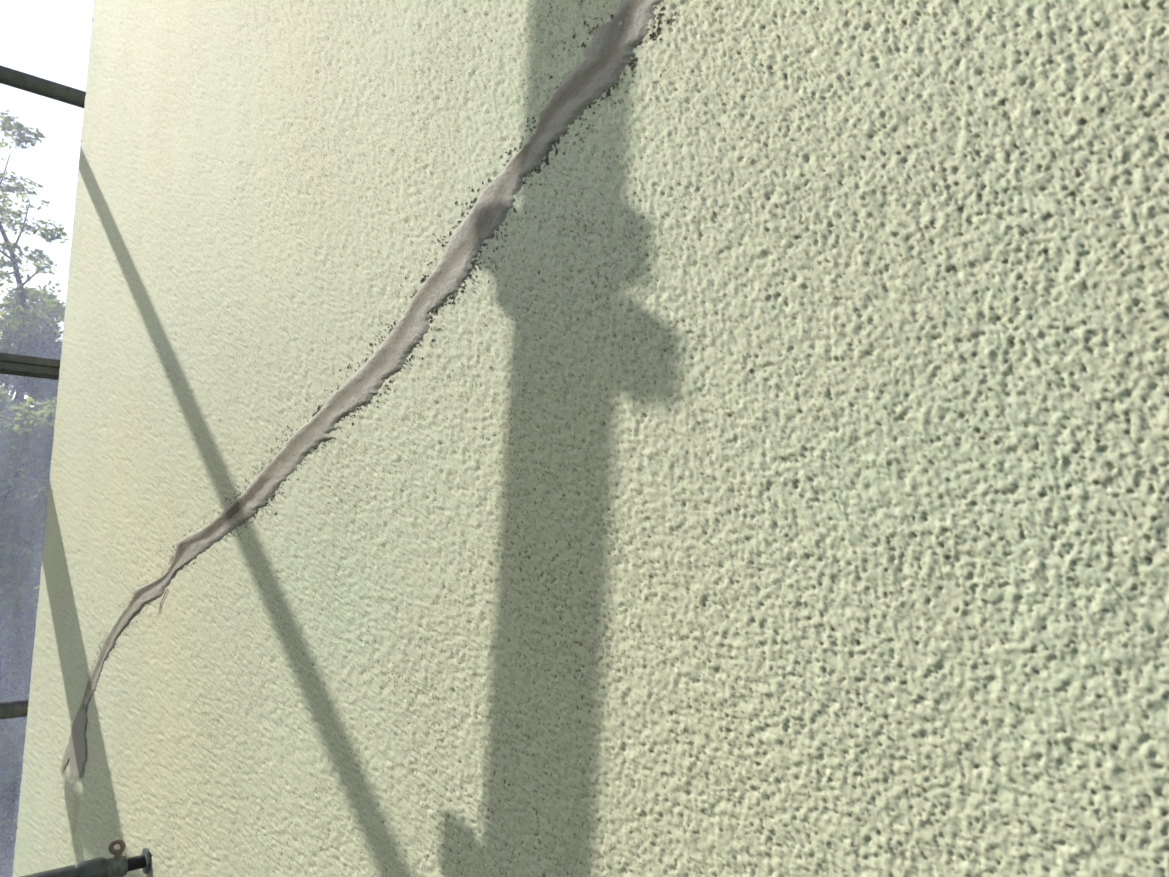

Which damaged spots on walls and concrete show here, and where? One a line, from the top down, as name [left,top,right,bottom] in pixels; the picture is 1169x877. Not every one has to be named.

crack [60,0,677,781]